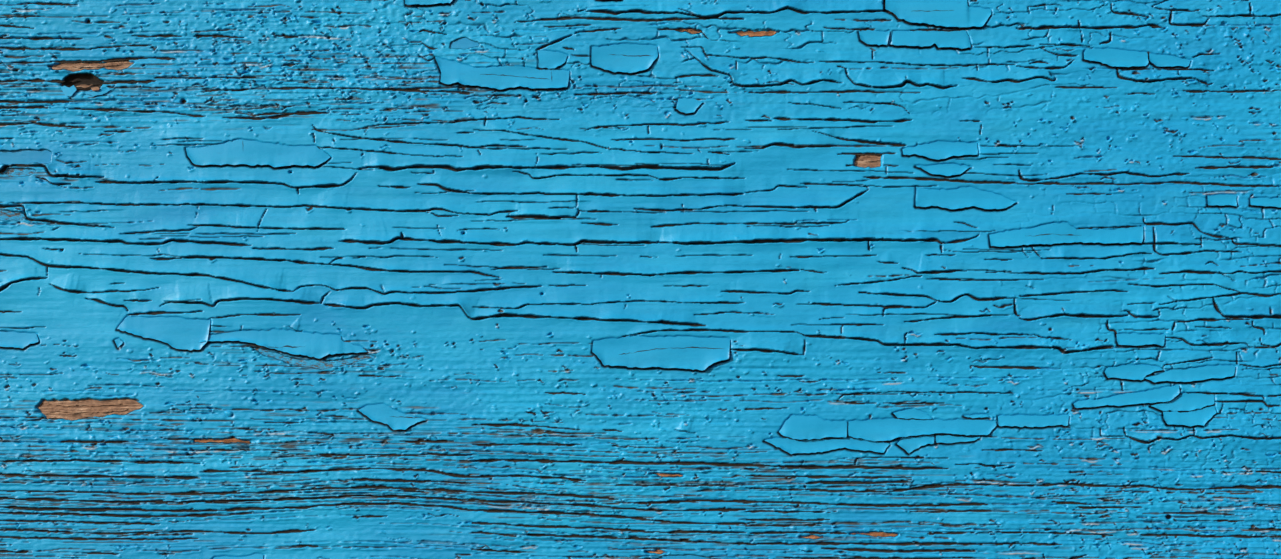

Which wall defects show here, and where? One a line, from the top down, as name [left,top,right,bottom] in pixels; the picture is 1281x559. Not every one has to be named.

peeling [52,60,133,97]
peeling [854,155,881,168]
crack [0,0,1281,407]
peeling [38,399,143,420]